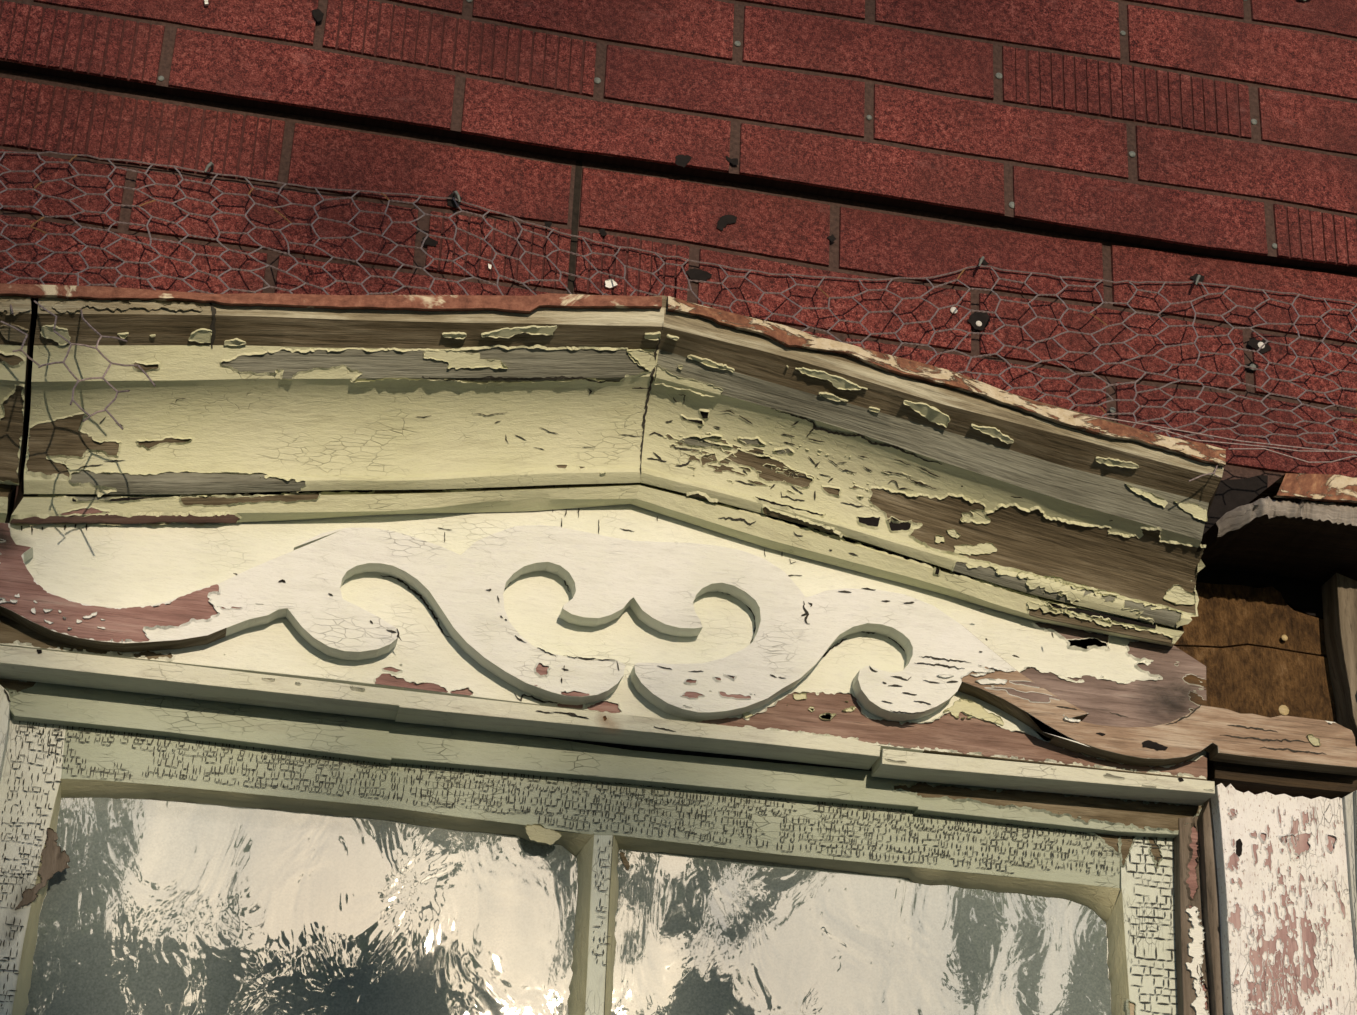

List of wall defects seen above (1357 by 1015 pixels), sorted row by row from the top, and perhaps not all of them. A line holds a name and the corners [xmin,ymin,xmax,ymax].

peeling [0,297,203,368]
peeling [132,360,161,372]
peeling [0,384,375,662]
peeling [0,678,37,697]
peeling [188,325,1357,1015]
crack [0,689,1211,1015]